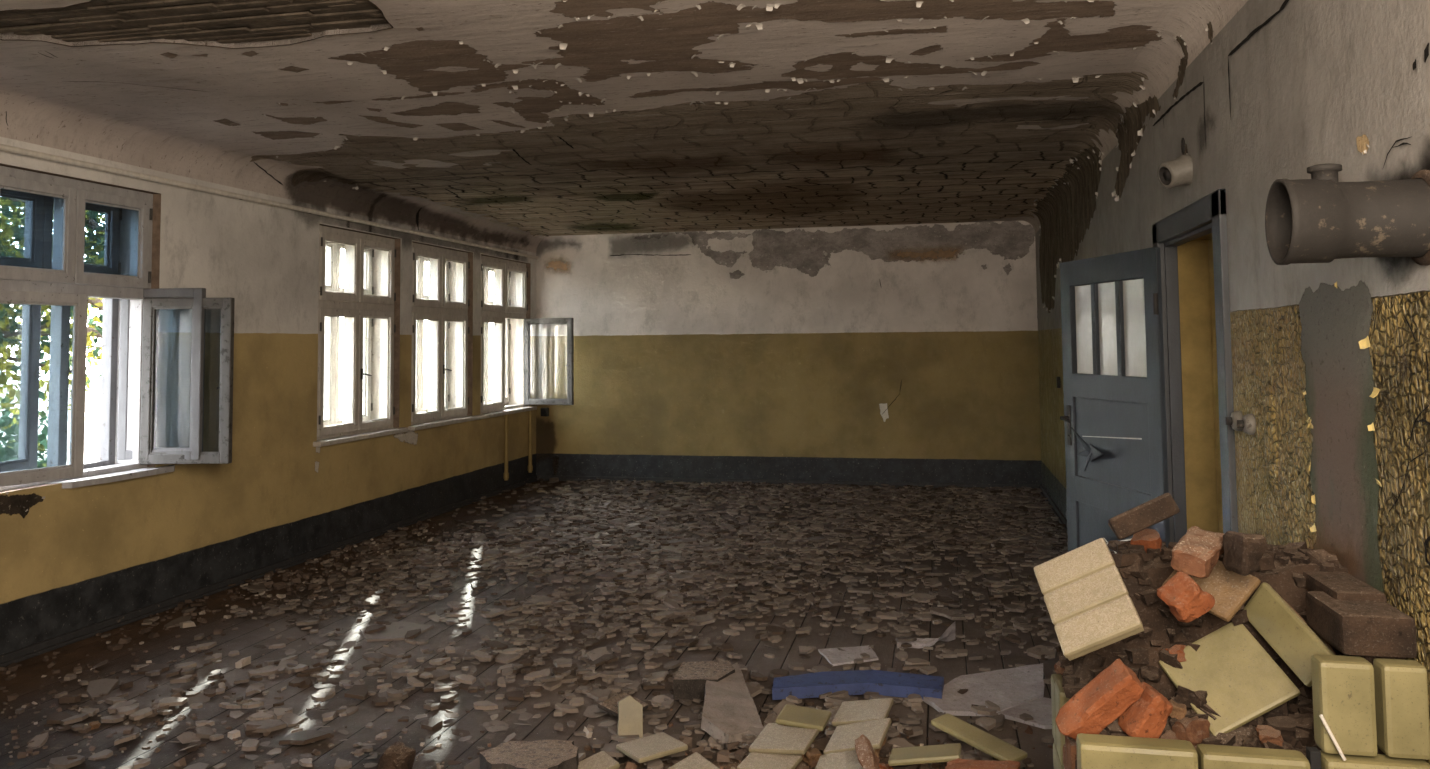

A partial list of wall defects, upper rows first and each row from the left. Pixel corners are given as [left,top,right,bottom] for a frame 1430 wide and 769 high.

peeling [0,0,1188,313]
peeling [0,492,45,519]
peeling [1299,281,1384,593]
crack [1386,313,1430,519]
crack [1422,536,1430,566]